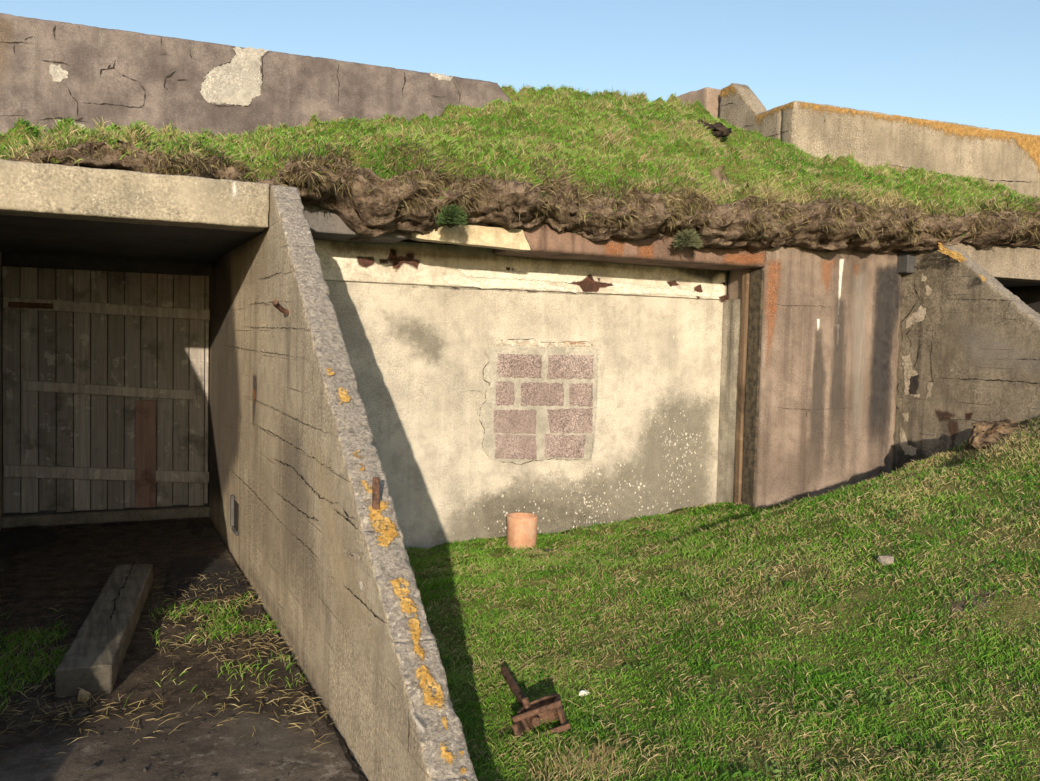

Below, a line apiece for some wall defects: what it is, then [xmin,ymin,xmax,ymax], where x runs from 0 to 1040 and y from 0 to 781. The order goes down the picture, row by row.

spalling [49,63,68,82]
crack [2,27,270,122]
spalling [200,47,269,107]
corrosion [357,249,420,269]
corrosion [493,223,778,328]
spalling [906,274,932,328]
leakage [811,259,844,443]
leakage [870,267,901,434]
spalling [902,355,933,398]
spalling [899,412,917,456]
crack [234,399,357,557]
crack [343,584,388,624]